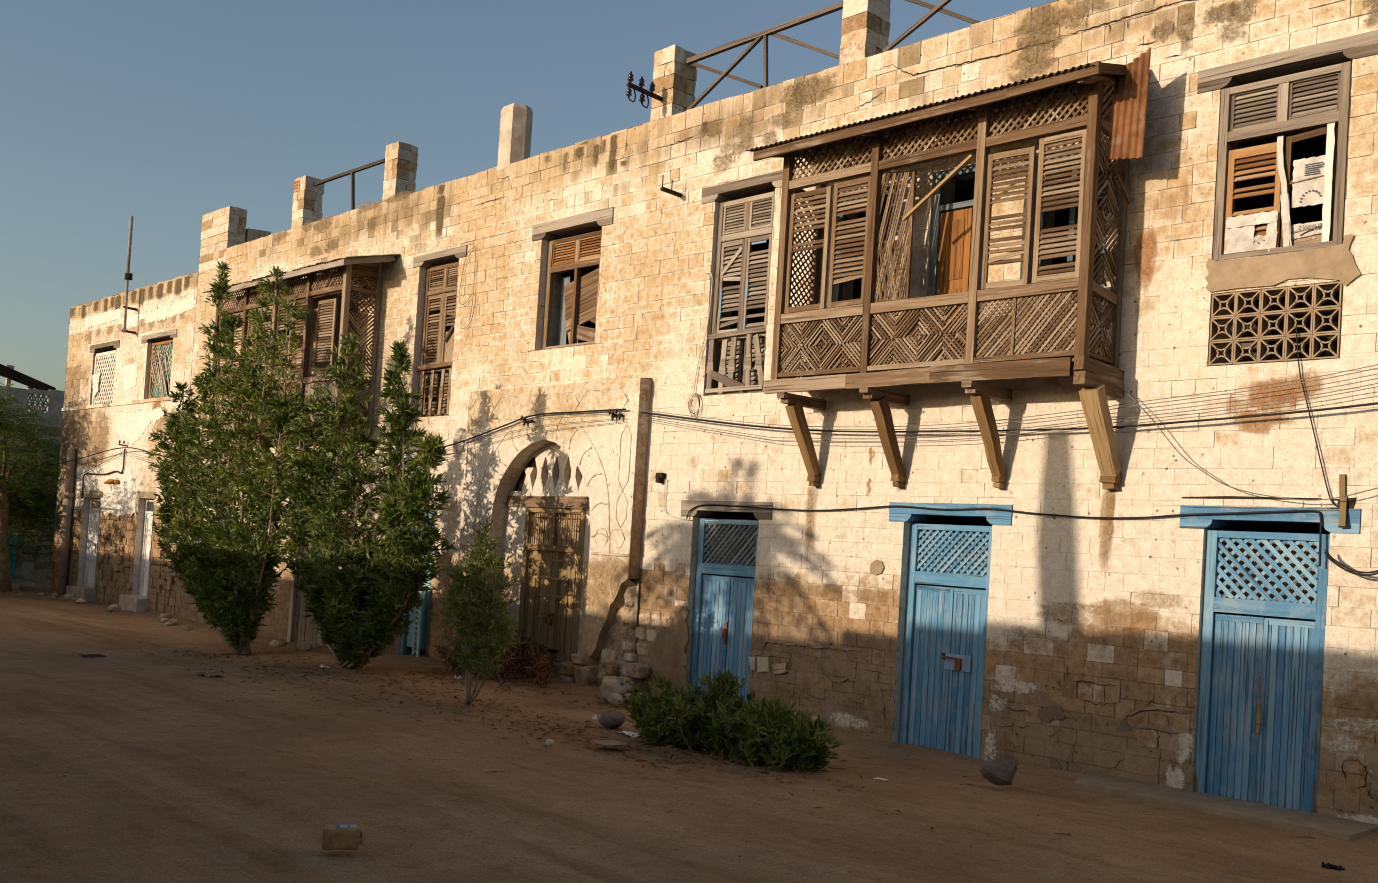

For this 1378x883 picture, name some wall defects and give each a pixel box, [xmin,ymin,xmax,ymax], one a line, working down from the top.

mould [1009,0,1104,82]
mould [1151,0,1257,50]
damp [1363,0,1378,24]
corrosion [1134,232,1155,282]
corrosion [1231,374,1319,433]
spalling [560,582,671,688]
spalling [749,656,788,674]
spalling [1038,680,1121,723]
spalling [1128,711,1191,752]
crack [1341,756,1374,799]